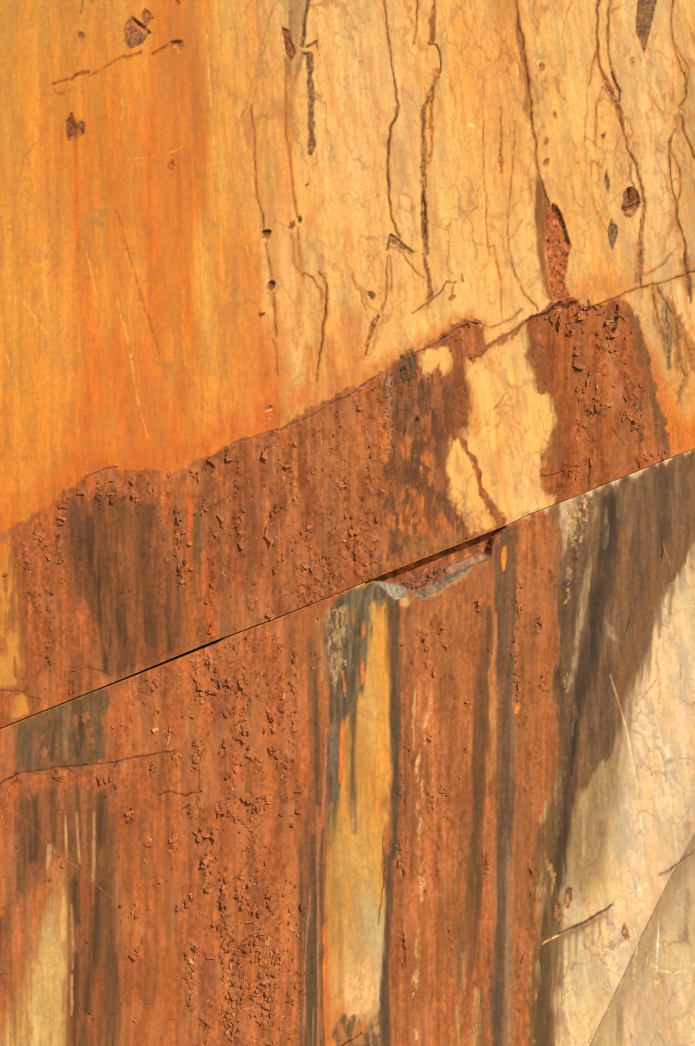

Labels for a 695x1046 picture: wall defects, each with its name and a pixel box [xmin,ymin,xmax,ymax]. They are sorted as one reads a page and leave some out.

spalling [66,112,86,141]
spalling [123,9,154,48]
rust [0,58,558,564]
crack [231,0,465,445]
crack [402,0,695,409]
spalling [604,168,641,250]
spalling [628,0,658,68]
water stain [0,488,186,1046]
crack [0,749,204,809]
rust [320,603,393,1046]
water stain [454,309,695,1046]
crack [539,834,695,1046]